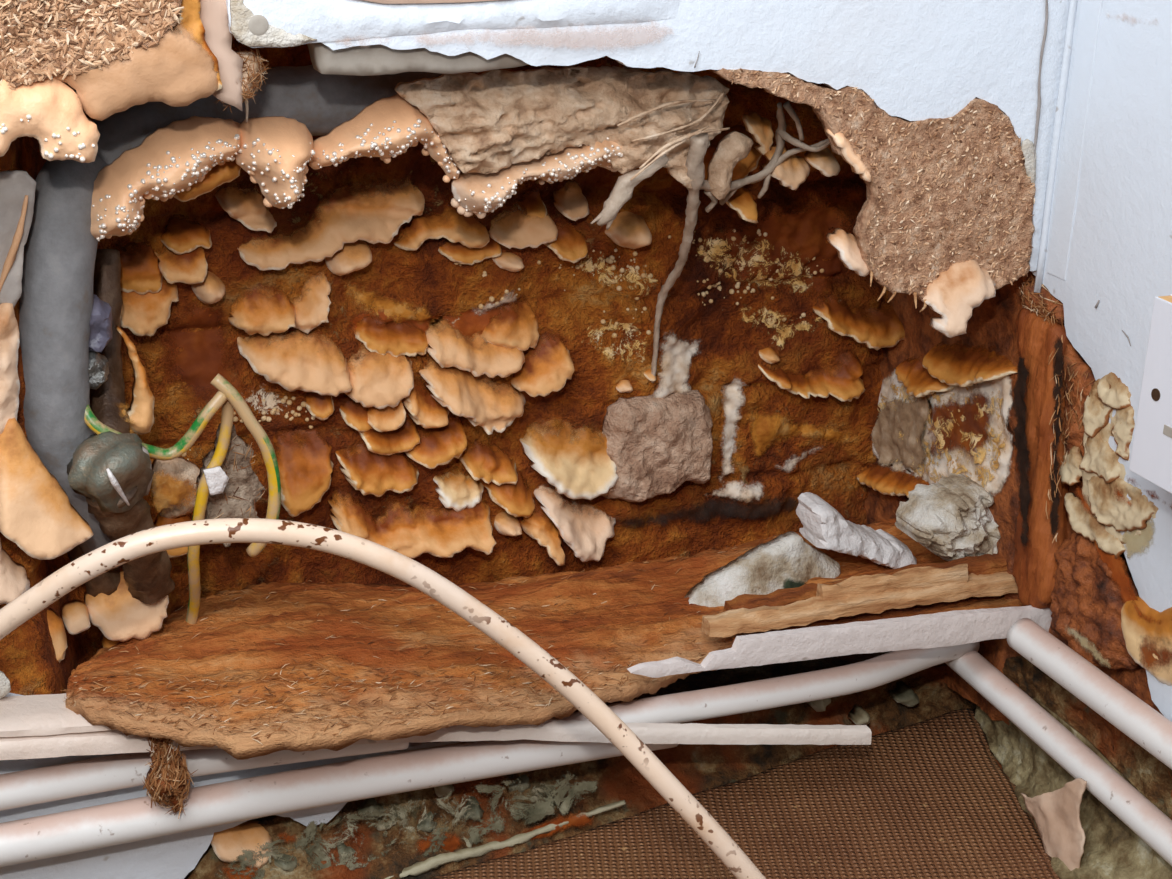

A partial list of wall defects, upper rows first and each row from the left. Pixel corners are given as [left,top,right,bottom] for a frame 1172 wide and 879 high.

flaking render [602,390,713,502]
flaking render [871,397,929,470]
water stain [1123,519,1154,556]
water stain [1068,629,1109,665]